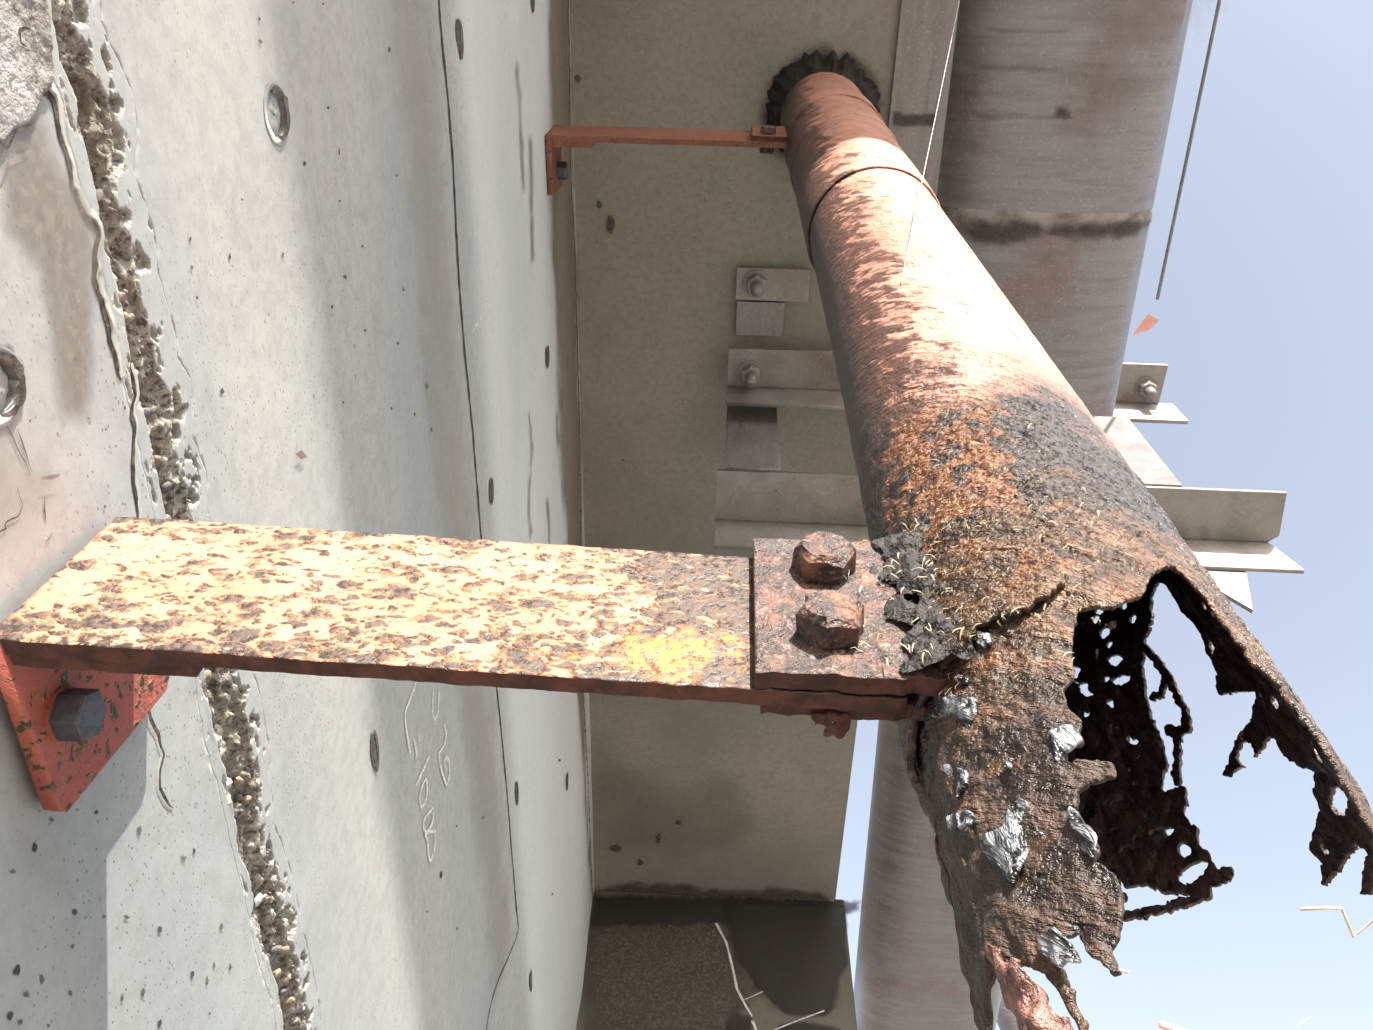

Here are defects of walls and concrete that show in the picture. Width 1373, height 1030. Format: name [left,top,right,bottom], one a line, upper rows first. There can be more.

peeling [0,0,55,150]
crack [43,0,210,522]
crack [0,428,53,542]
crack [145,710,173,812]
crack [195,668,321,1030]
peeling [1068,806,1098,859]